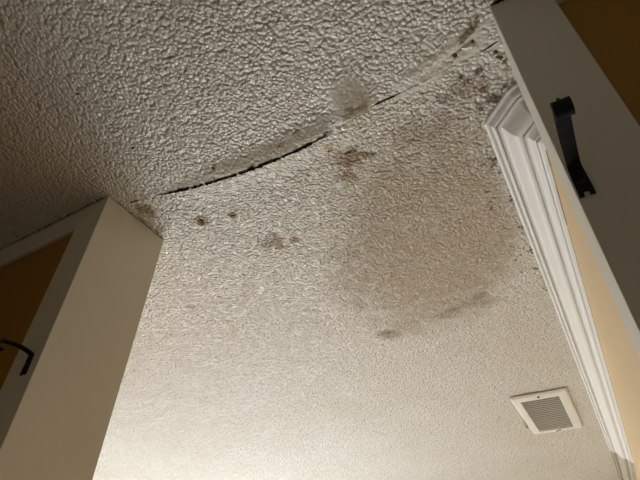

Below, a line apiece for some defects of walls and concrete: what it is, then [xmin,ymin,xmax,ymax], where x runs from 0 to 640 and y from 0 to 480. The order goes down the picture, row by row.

crack [364,60,465,114]
leakage [452,68,486,97]
leakage [478,84,508,111]
crack [156,131,333,196]
leakage [336,150,378,182]
leakage [261,233,299,249]
leakage [356,165,503,299]